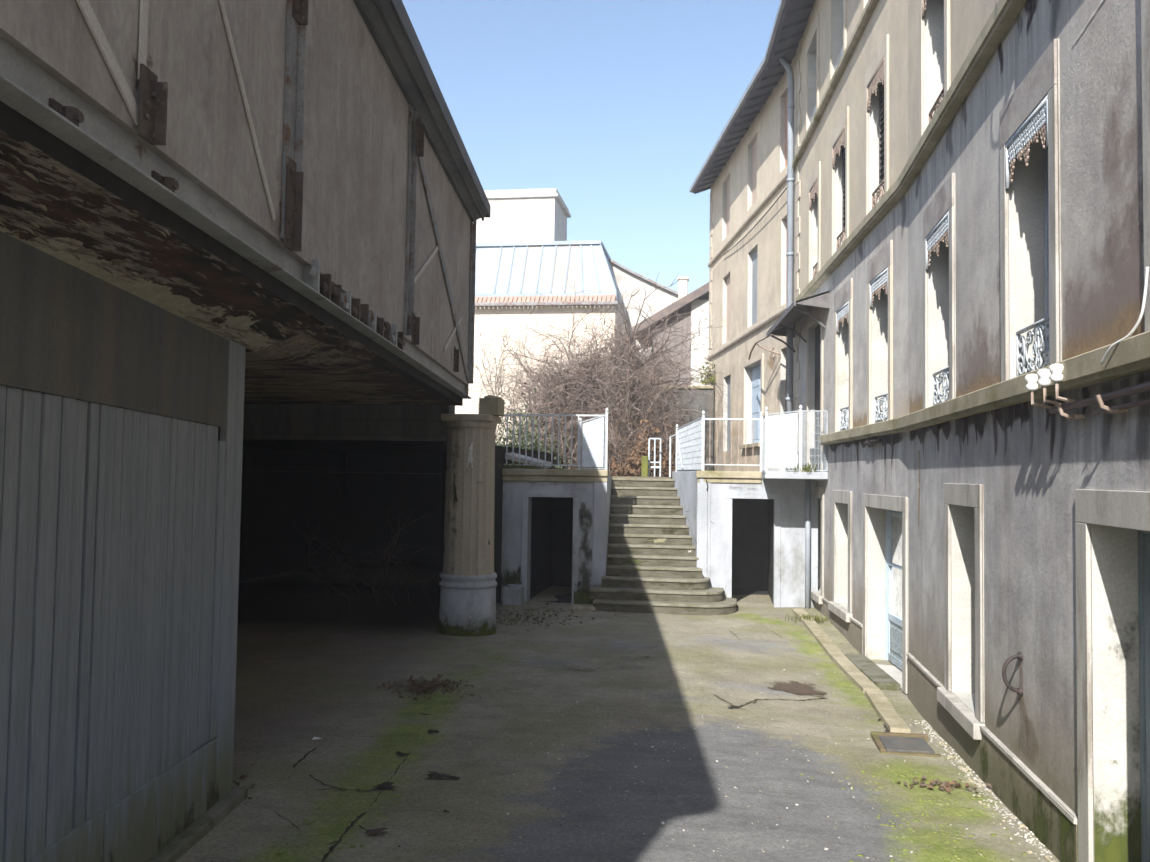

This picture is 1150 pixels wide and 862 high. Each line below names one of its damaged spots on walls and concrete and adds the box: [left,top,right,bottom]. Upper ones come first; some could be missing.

peeling [0,131,442,404]
damp [1063,183,1144,360]
damp [910,397,923,413]
damp [830,401,1030,524]
damp [1045,395,1055,457]
crack [293,748,411,862]